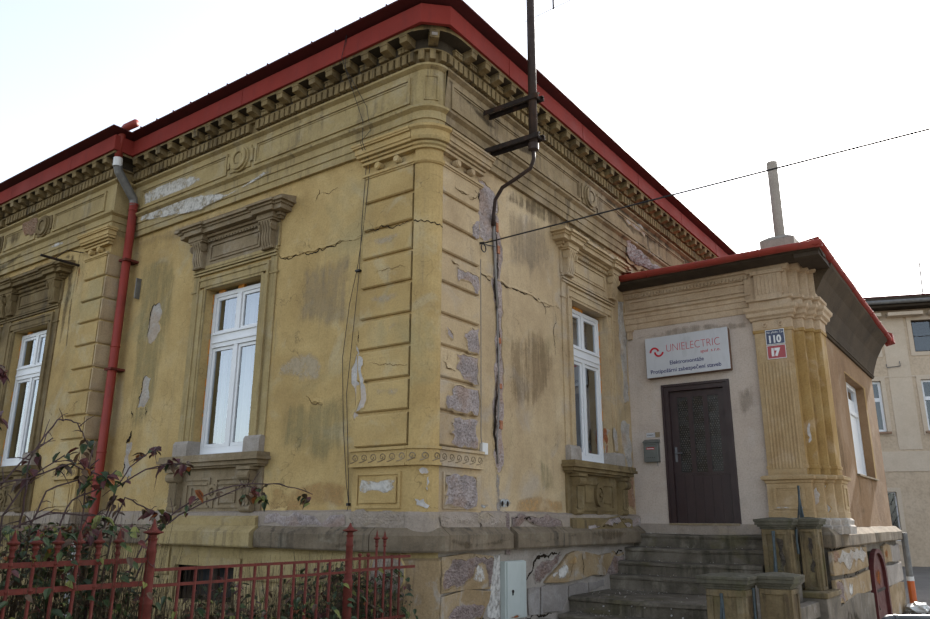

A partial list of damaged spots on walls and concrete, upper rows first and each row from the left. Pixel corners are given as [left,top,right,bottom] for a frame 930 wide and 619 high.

crack [279,219,443,260]
spalling [624,217,660,271]
spalling [147,302,162,344]
crack [452,185,561,474]
spalling [137,376,151,409]
spalling [351,344,368,420]
spalling [445,327,481,449]
spalling [439,474,563,530]
spalling [441,554,494,591]
spalling [832,545,866,571]